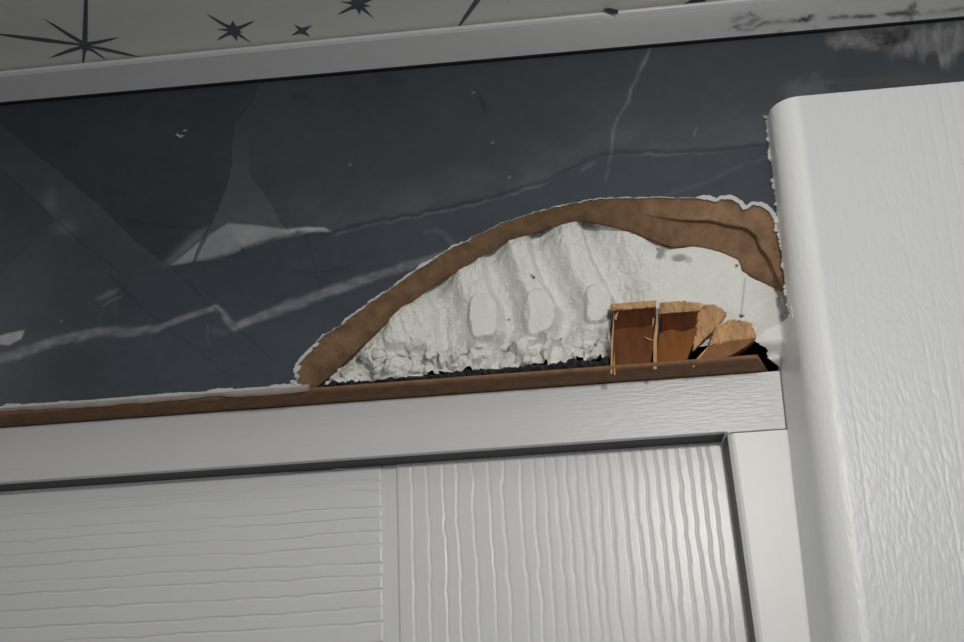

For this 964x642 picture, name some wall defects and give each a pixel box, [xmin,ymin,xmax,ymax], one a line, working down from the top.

flaking render [290,115,793,388]